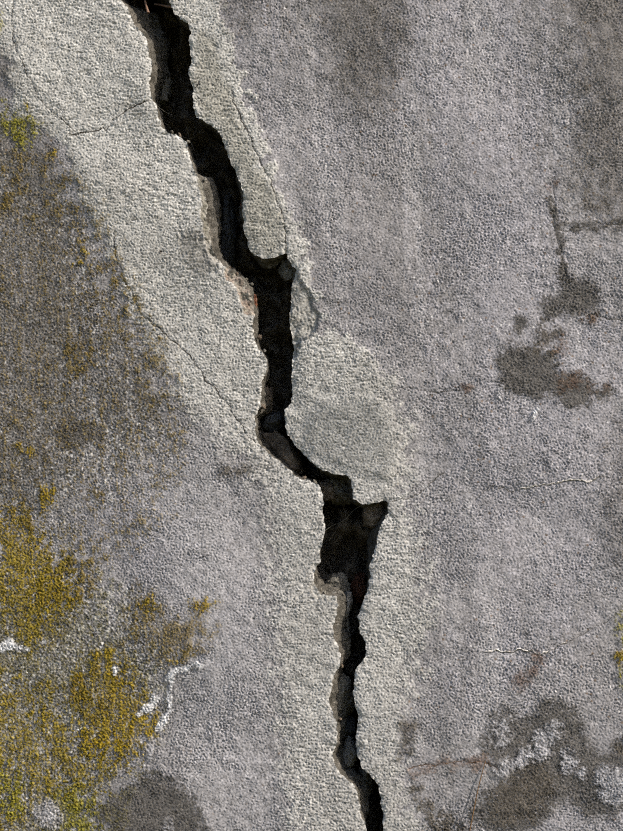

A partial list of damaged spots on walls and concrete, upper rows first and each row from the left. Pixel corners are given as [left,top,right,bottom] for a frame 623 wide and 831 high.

leakage [494,196,623,420]
leakage [55,412,106,450]
crack [11,0,444,831]
leakage [0,638,30,652]
leakage [32,799,63,831]
leakage [91,661,212,831]
leakage [396,719,420,761]
leakage [410,696,623,831]